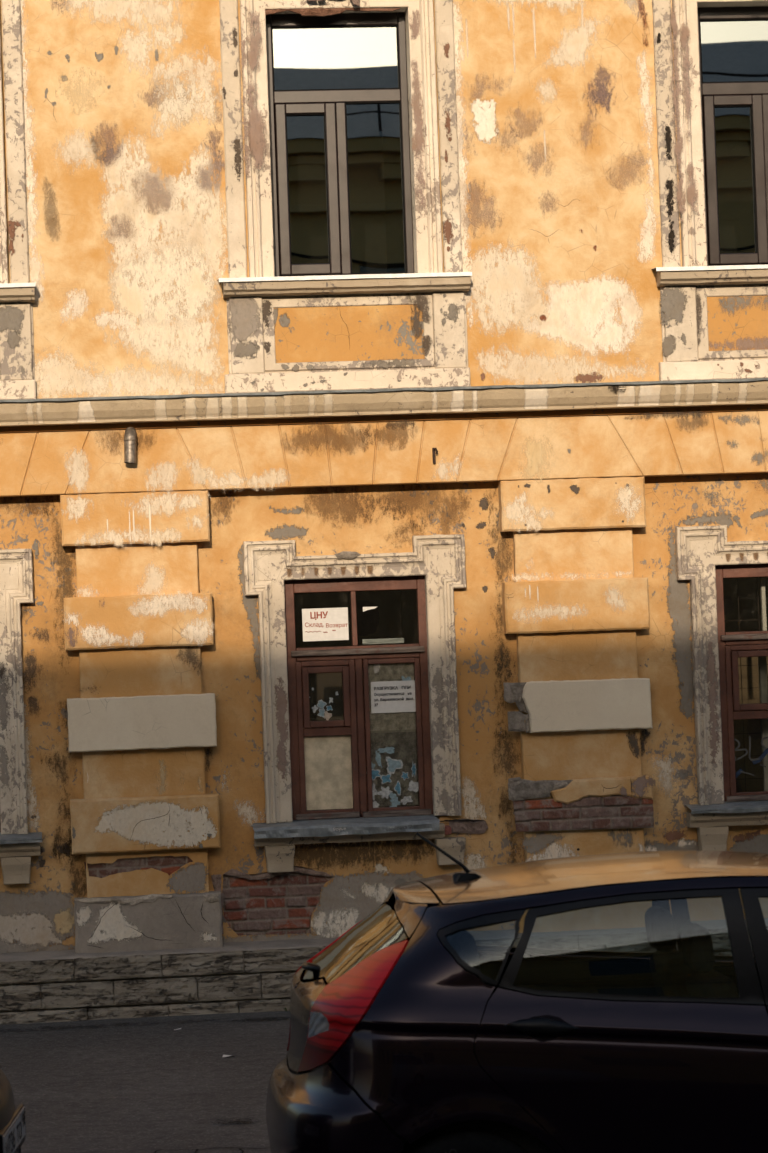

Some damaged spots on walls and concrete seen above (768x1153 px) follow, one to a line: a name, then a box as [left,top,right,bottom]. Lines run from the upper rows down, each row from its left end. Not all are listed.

leakage [583,67,615,115]
leakage [91,124,123,160]
peeling [21,0,420,399]
peeling [440,0,646,385]
spalling [659,285,688,357]
peeling [75,467,290,546]
peeling [65,564,214,647]
peeling [666,508,768,764]
peeling [84,800,217,878]
spalling [508,756,699,862]
peeling [0,894,172,948]
flaking render [201,862,425,945]